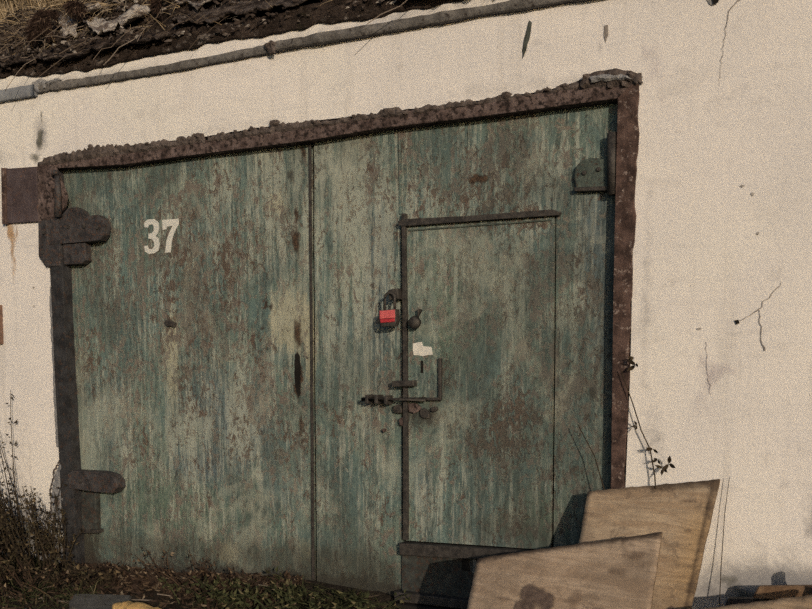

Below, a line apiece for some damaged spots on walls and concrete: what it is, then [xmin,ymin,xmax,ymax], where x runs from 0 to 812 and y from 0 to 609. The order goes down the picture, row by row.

crack [735,281,782,351]
corrosion [294,322,303,398]
spalling [36,461,63,563]